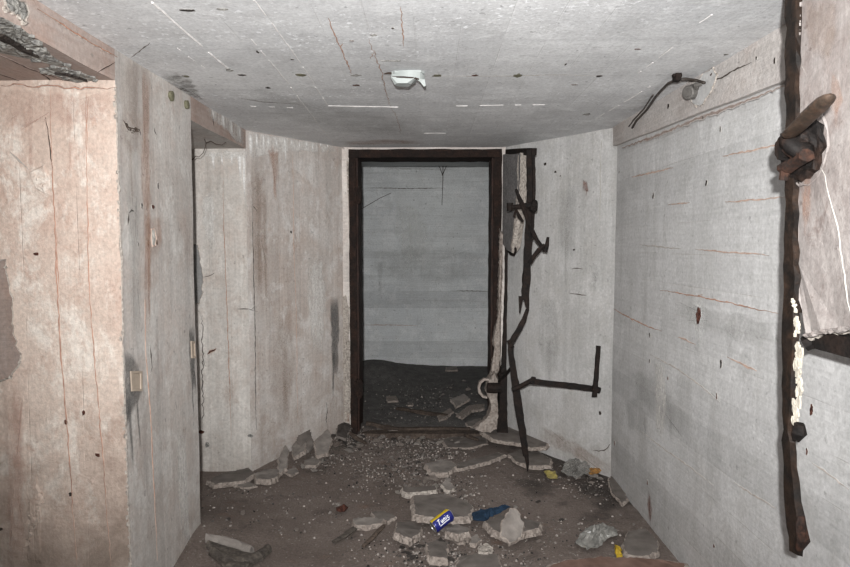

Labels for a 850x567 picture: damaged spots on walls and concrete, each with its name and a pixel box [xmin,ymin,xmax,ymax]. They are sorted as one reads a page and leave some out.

spalling [0,0,98,83]
crack [328,18,352,74]
crack [369,40,401,133]
peeling [0,259,22,382]
leakage [309,263,339,385]